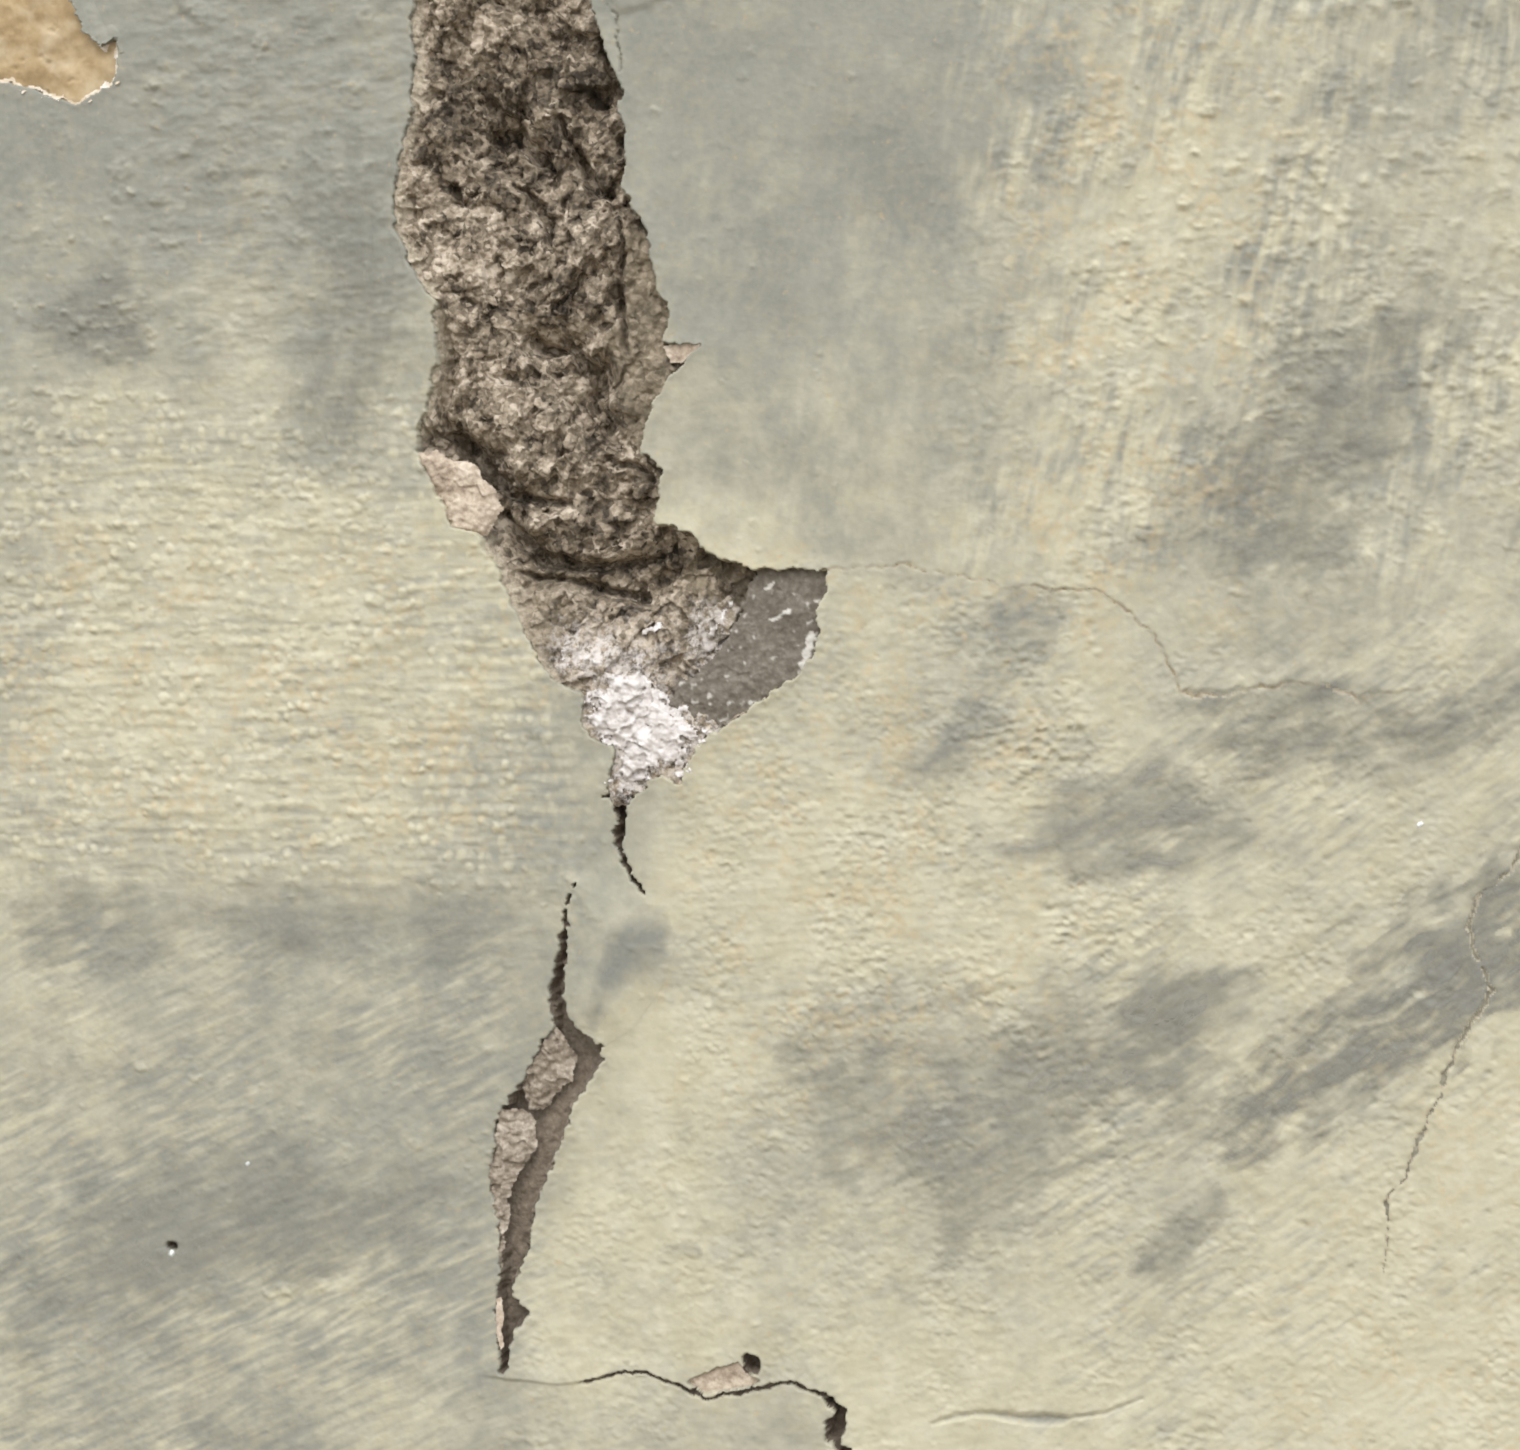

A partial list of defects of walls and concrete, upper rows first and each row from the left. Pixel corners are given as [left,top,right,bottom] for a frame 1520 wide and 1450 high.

peeling [0,0,124,105]
flaking render [394,0,827,807]
crack [1044,588,1328,698]
crack [602,795,645,894]
crack [1382,847,1520,1272]
crack [488,883,605,1374]
crack [584,1353,852,1450]